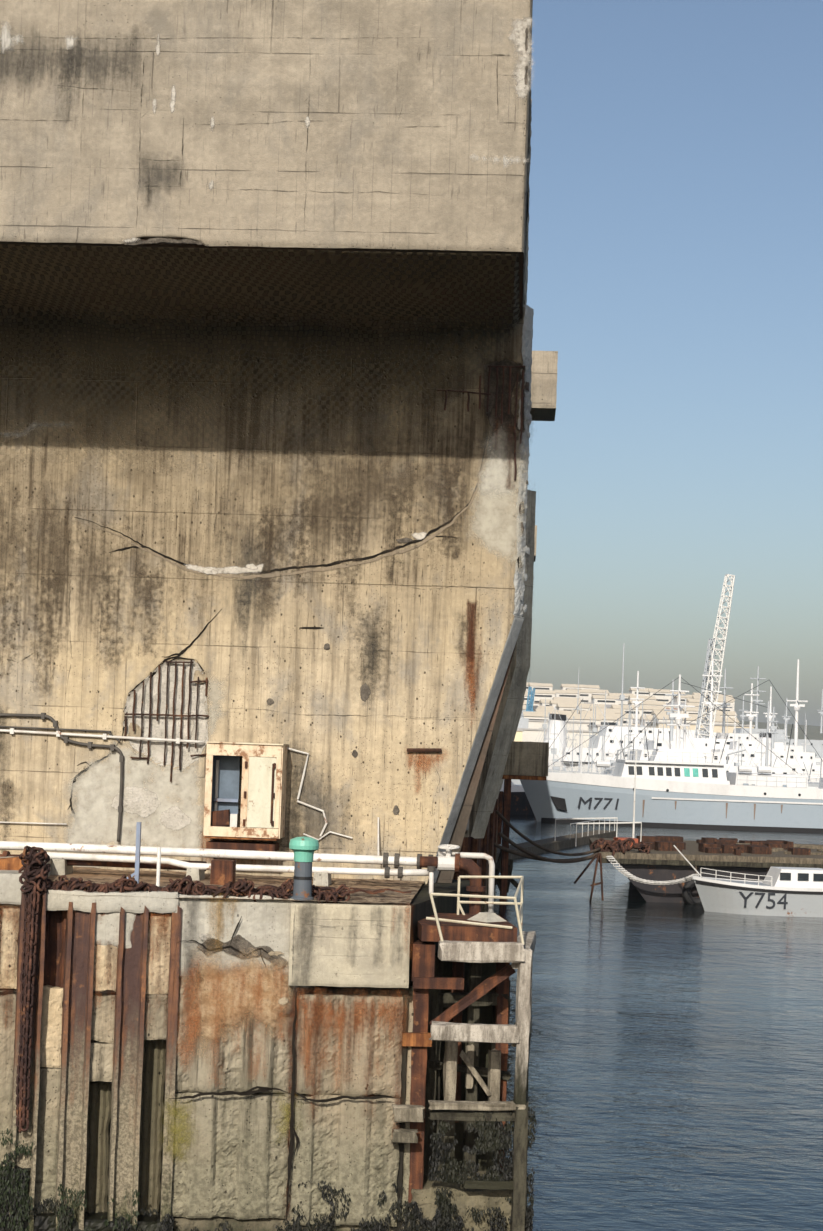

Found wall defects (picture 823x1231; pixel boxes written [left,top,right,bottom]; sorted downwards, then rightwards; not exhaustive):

damp [0,23,128,79]
spalling [509,18,533,98]
crack [74,427,491,579]
damp [309,435,466,554]
damp [0,511,104,624]
rust [463,603,477,701]
peeling [67,660,209,848]
crack [68,609,222,835]
rust [407,748,442,770]
peeling [190,934,300,1049]
crack [169,916,402,1219]
rust [280,992,389,1091]